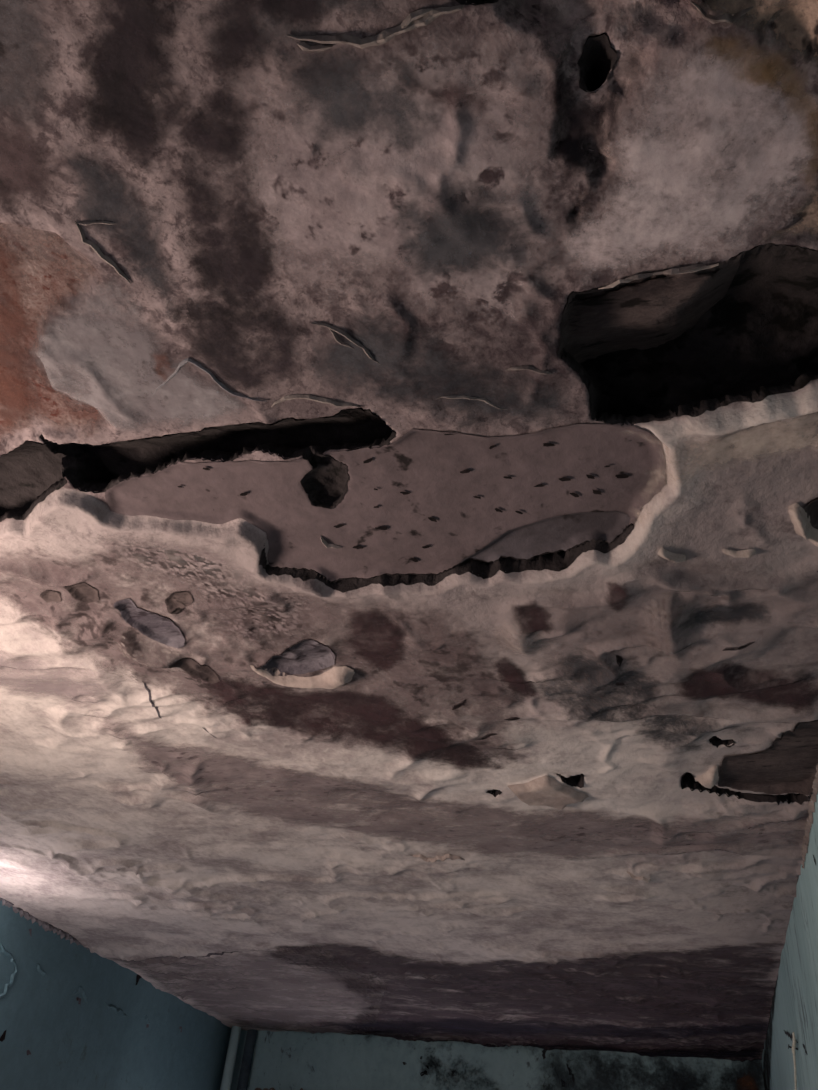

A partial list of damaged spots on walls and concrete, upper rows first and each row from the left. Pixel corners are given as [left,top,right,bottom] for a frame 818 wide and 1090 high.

damp [83,0,181,169]
damp [556,84,624,185]
flaking render [506,0,818,163]
damp [36,49,558,429]
flaking render [785,192,818,234]
flaking render [105,243,818,581]
flaking render [250,665,355,689]
damp [0,541,727,769]
damp [683,604,767,625]
damp [680,665,818,710]
flaking render [695,720,818,869]
damp [115,944,782,1090]